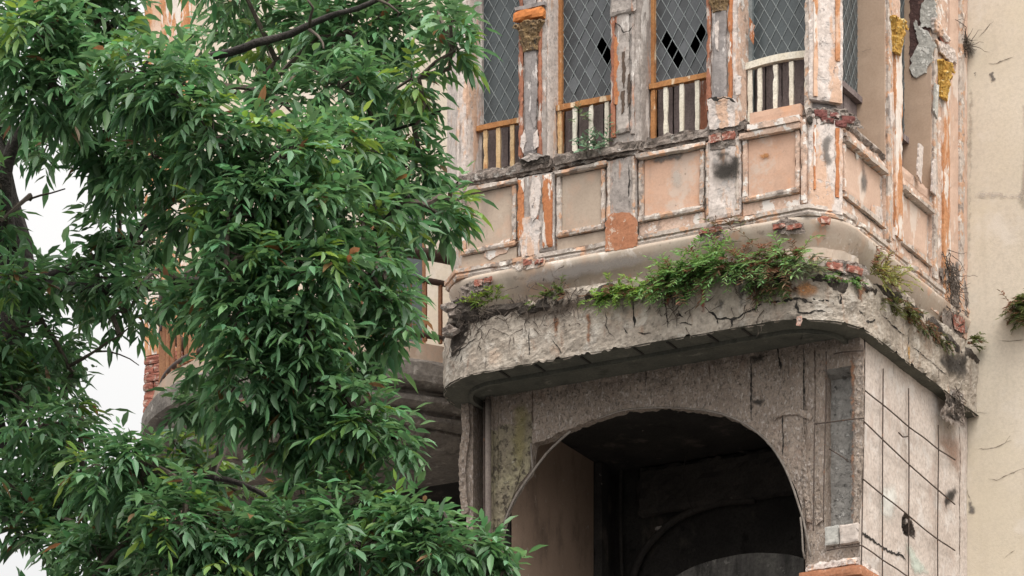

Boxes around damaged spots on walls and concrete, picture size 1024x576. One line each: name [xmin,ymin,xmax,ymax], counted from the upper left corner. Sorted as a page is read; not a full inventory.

peeling [909,0,958,78]
flaking render [806,107,864,129]
peeling [484,56,550,271]
leakage [713,152,740,178]
peeling [605,212,638,252]
flaking render [824,259,870,278]
spalling [440,276,493,358]
crack [605,282,948,378]
crack [858,530,906,560]